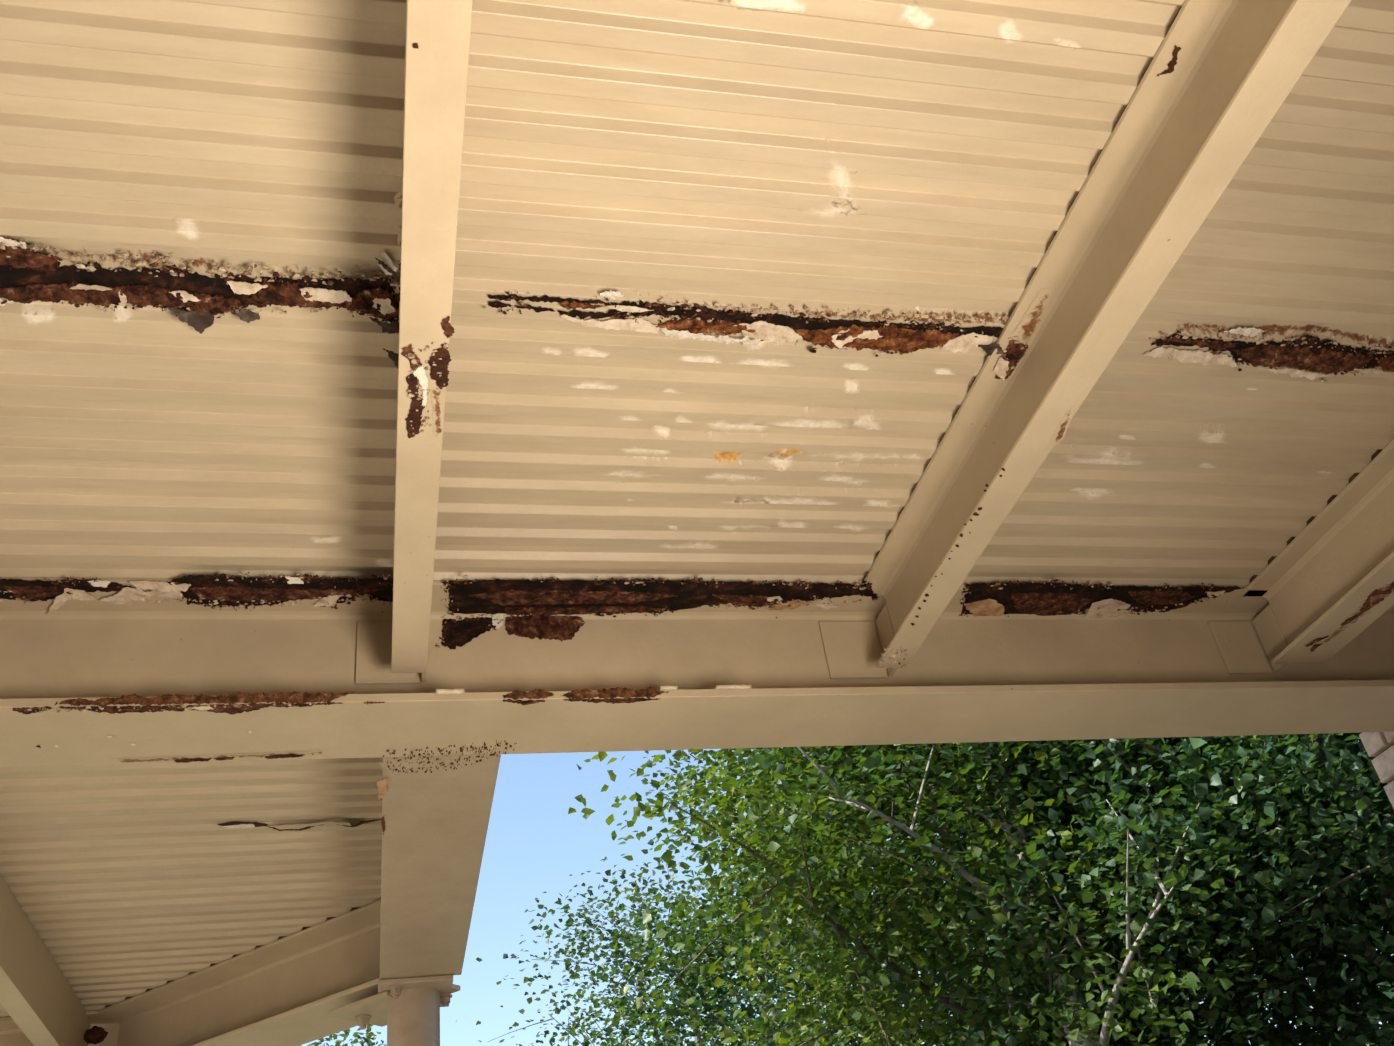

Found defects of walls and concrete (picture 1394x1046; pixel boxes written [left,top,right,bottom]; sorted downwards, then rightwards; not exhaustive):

corrosion [394,192,402,247]
corrosion [0,235,400,323]
corrosion [488,288,1055,381]
corrosion [1155,319,1394,372]
corrosion [383,316,455,440]
corrosion [0,578,127,602]
corrosion [172,575,393,607]
corrosion [441,578,878,650]
corrosion [12,691,385,715]
corrosion [503,686,678,705]